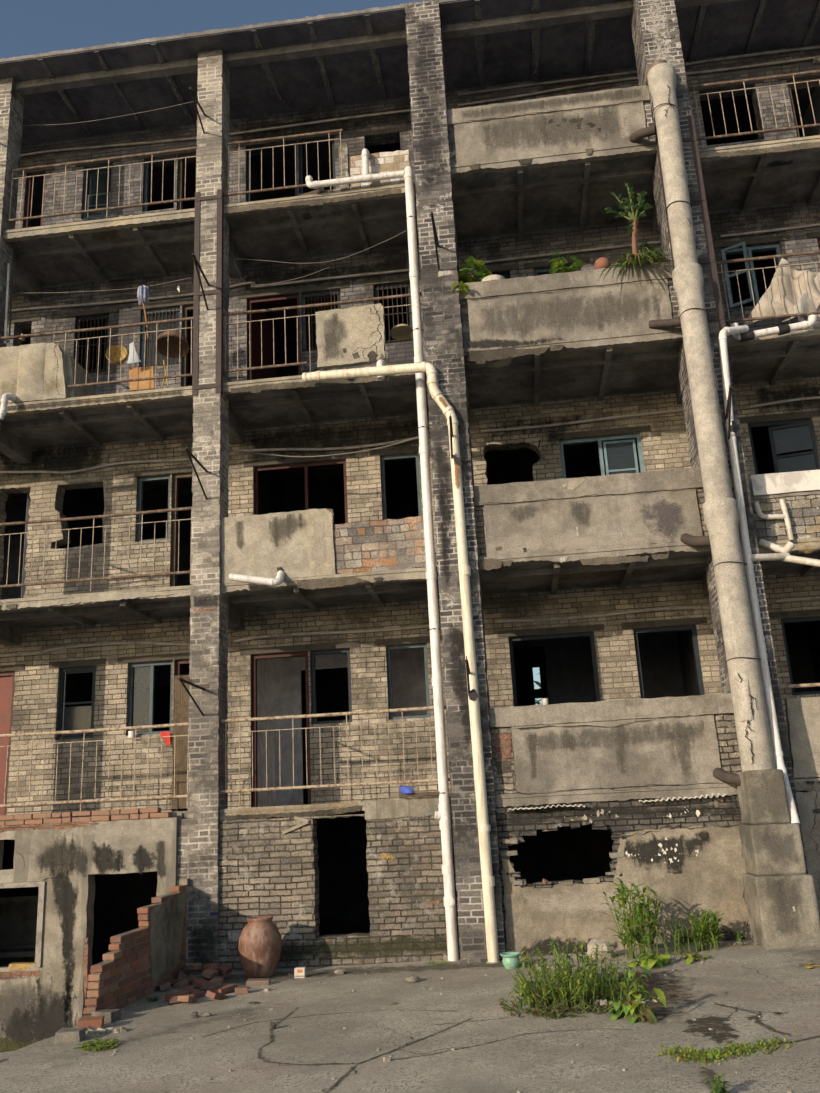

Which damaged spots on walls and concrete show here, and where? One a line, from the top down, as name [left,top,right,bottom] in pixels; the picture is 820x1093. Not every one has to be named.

water stain [325,314,346,359]
water stain [269,514,305,546]
water stain [500,504,648,562]
water stain [641,500,682,550]
water stain [527,705,704,778]
crack [738,673,758,763]
spalling [500,809,639,862]
spalling [506,872,623,888]
water stain [0,825,168,1045]
crack [714,962,820,1046]
crack [203,1005,634,1093]
crack [700,1067,716,1088]